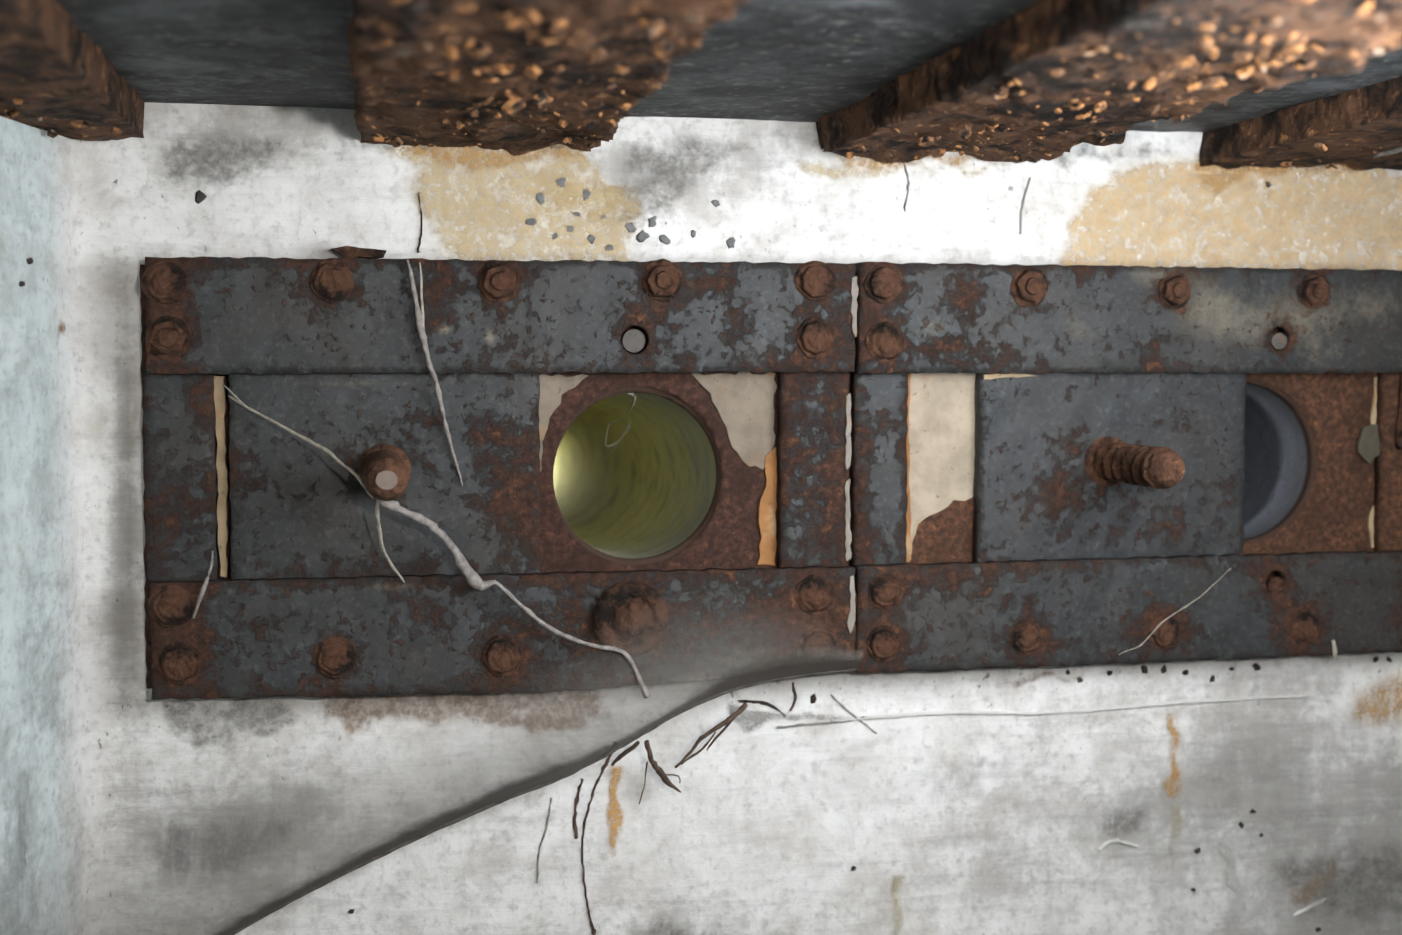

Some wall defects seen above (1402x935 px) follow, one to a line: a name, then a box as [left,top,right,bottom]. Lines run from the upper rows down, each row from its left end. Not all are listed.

rust [757,447,777,566]
rust [1358,681,1402,719]
rust [1166,718,1179,795]
crack [537,754,612,935]
rust [609,767,622,848]